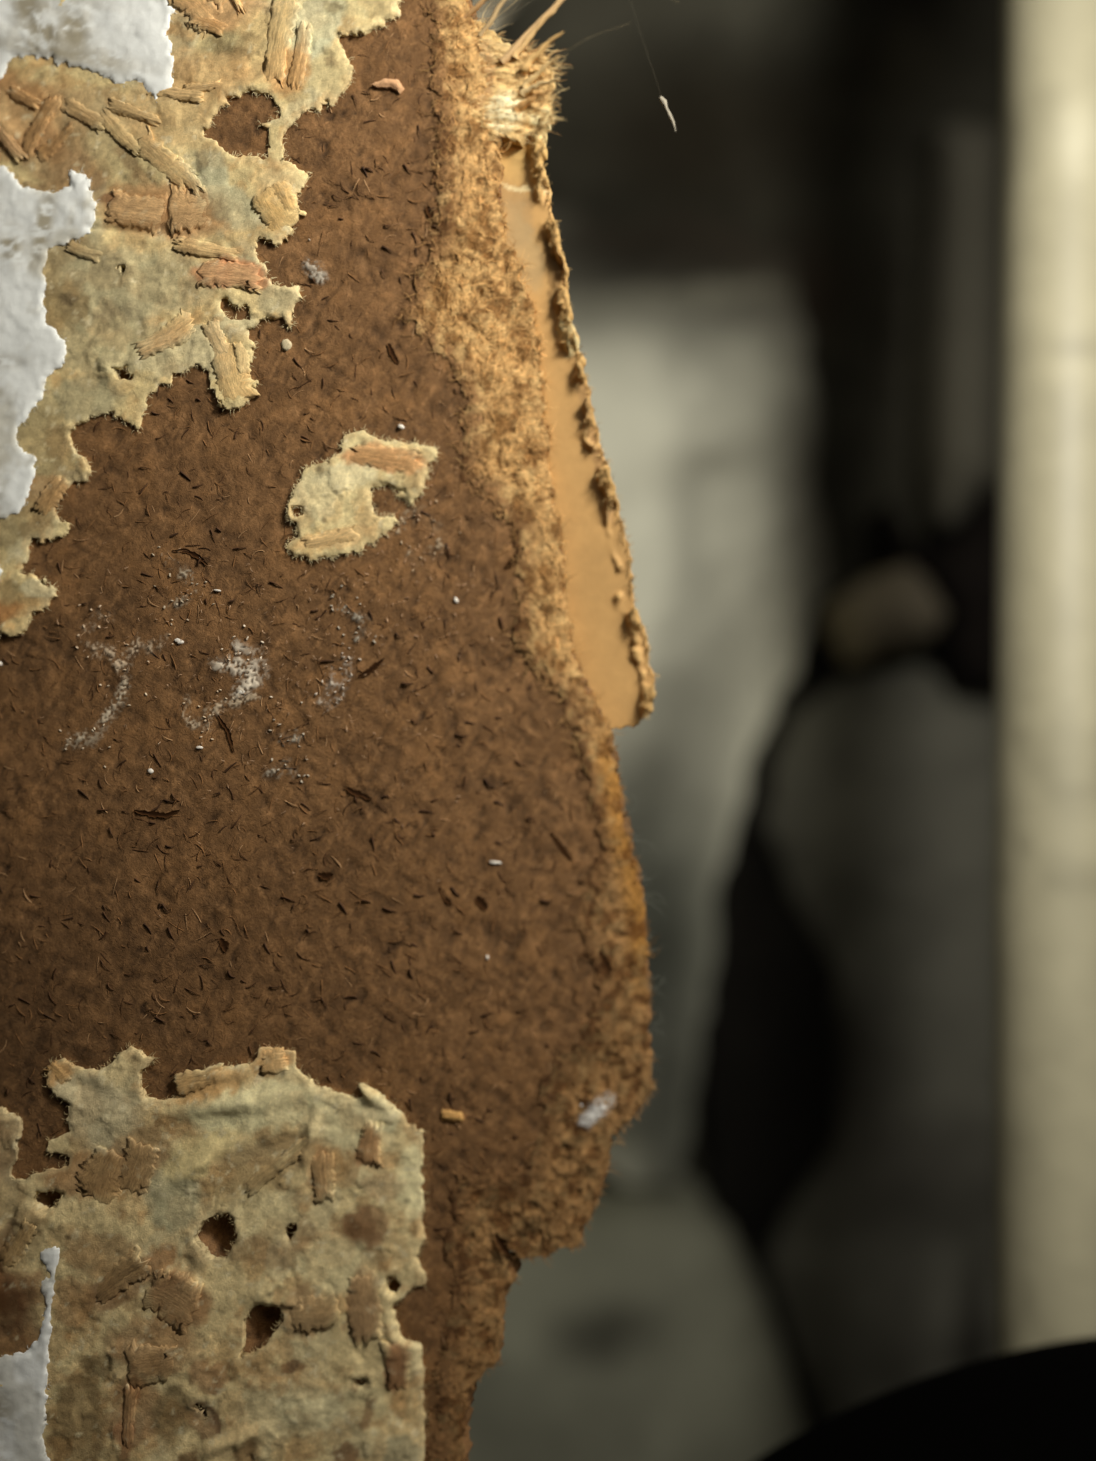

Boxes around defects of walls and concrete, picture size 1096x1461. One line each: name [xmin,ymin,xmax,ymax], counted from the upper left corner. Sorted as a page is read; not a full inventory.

peeling [0,165,100,518]
peeling [281,339,292,351]
peeling [497,39,660,730]
peeling [0,1246,60,1461]